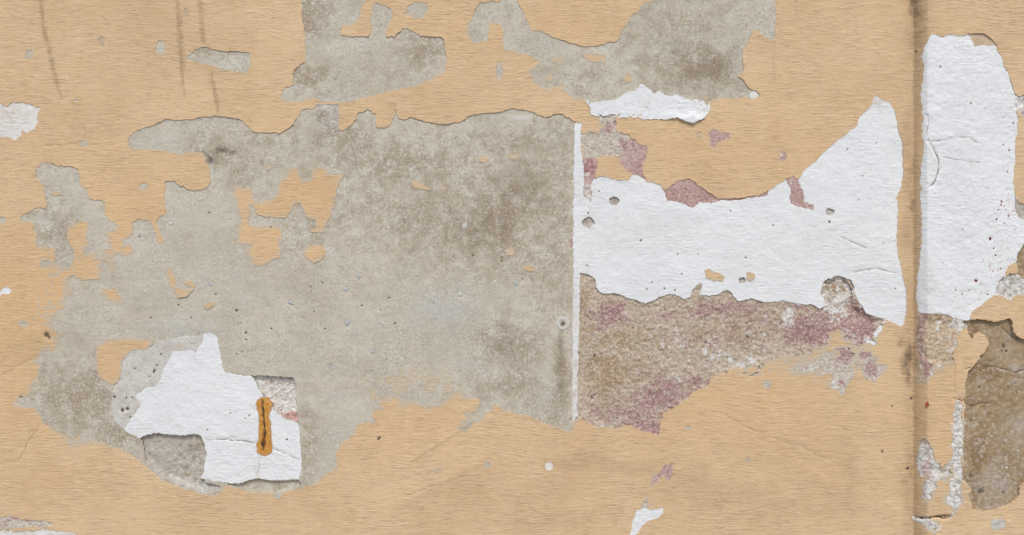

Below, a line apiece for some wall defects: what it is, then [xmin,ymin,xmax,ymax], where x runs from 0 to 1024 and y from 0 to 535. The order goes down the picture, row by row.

corrosion [256,397,272,456]
peeling [14,104,577,499]
peeling [281,0,447,103]
peeling [467,0,907,435]
peeling [906,33,1024,518]